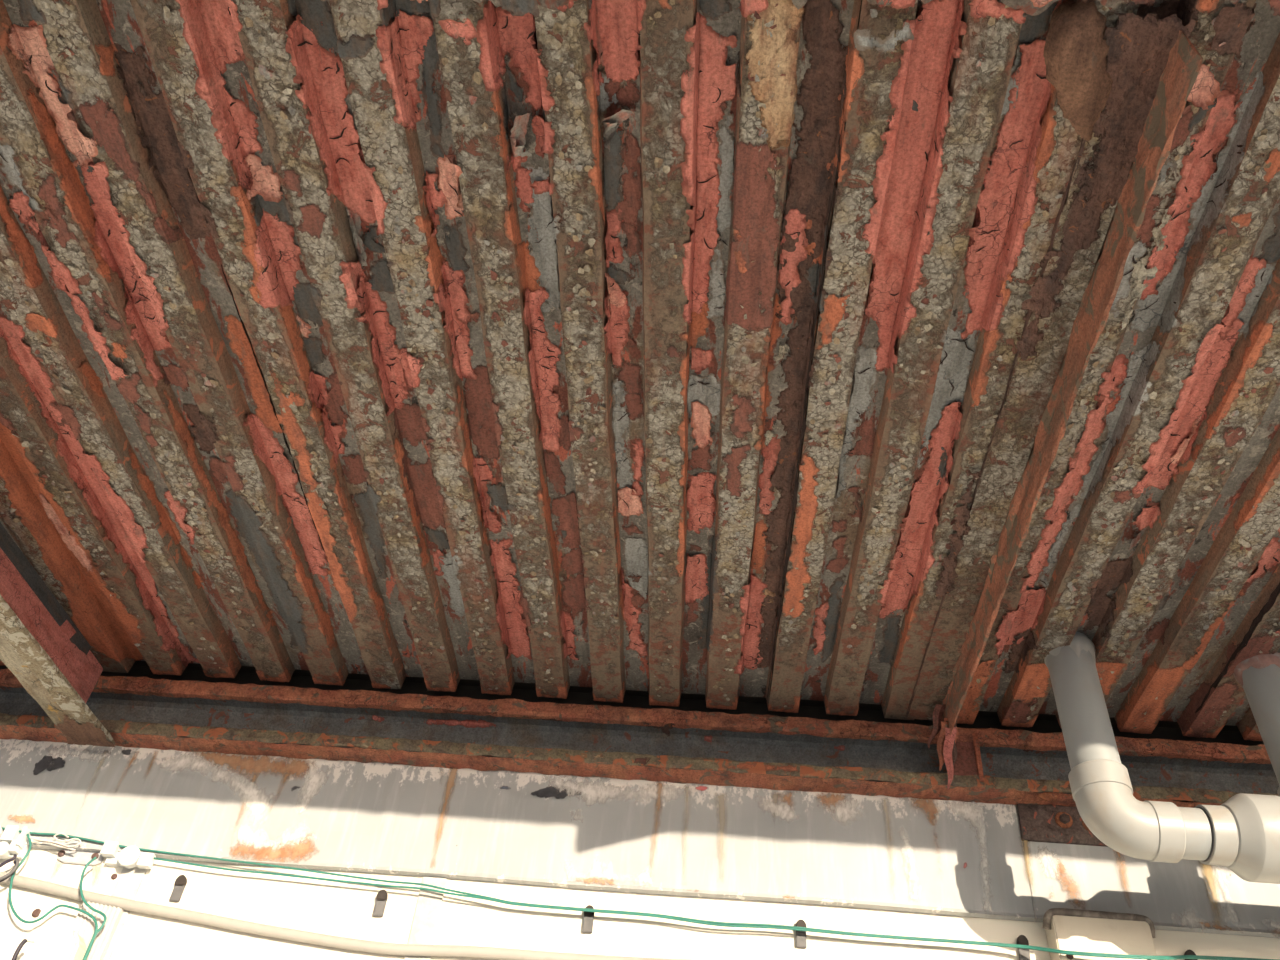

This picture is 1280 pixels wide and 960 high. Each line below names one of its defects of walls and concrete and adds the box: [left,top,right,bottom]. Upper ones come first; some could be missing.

peeling [0,286,220,669]
corrosion [196,751,310,784]
corrosion [231,837,315,863]
peeling [160,0,675,697]
corrosion [424,671,457,692]
corrosion [437,768,457,842]
corrosion [535,681,568,699]
peeling [617,430,781,701]
peeling [654,0,791,324]
corrosion [913,798,938,823]
peeling [808,0,1070,443]
peeling [970,205,1280,688]